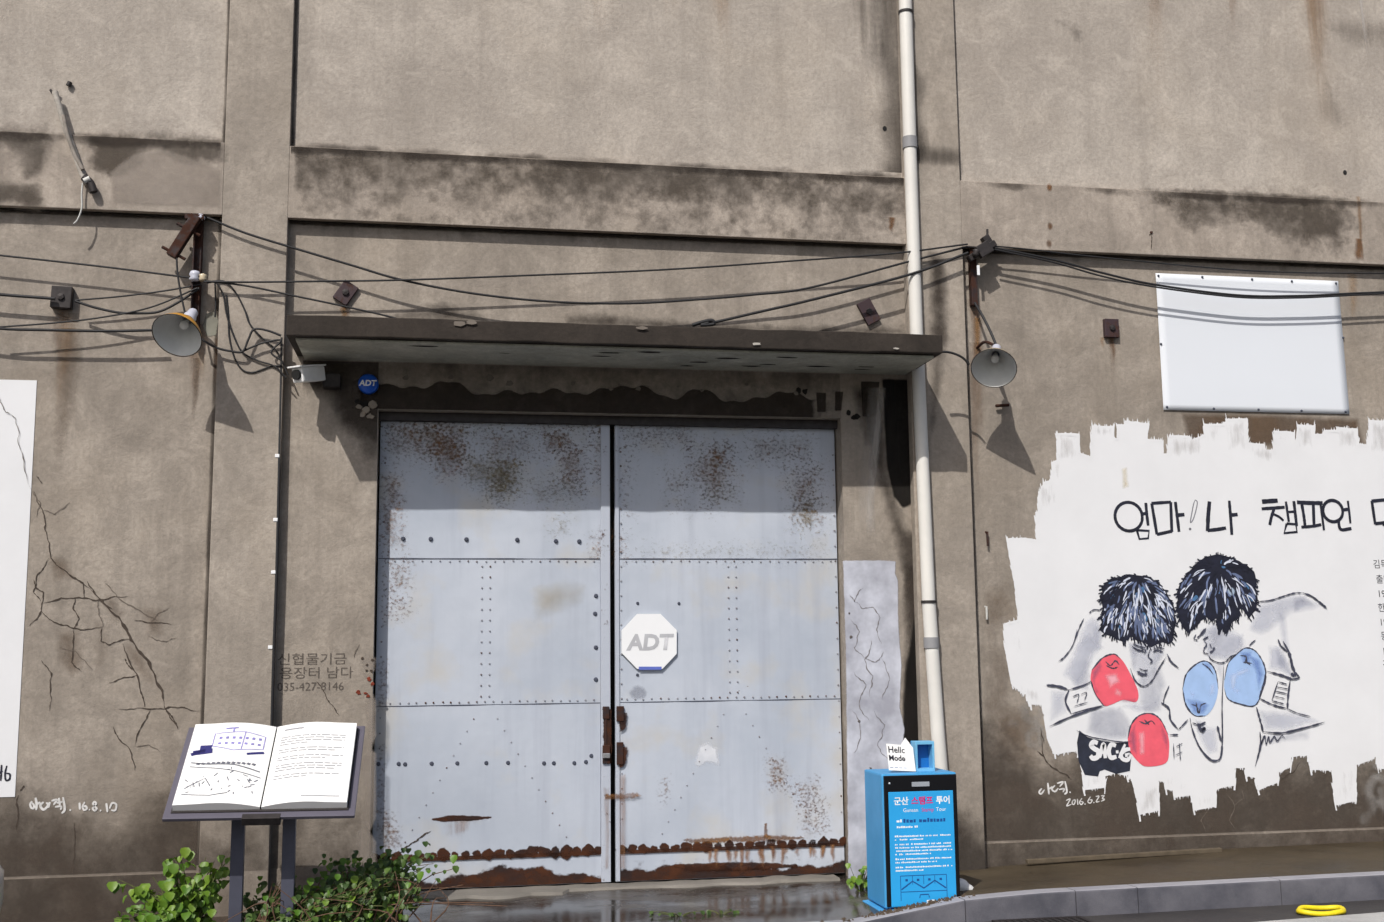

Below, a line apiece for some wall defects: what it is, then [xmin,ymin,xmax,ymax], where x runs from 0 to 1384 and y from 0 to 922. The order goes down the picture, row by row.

peeling [355,357,879,420]
crack [0,401,194,769]
corrosion [370,812,846,890]